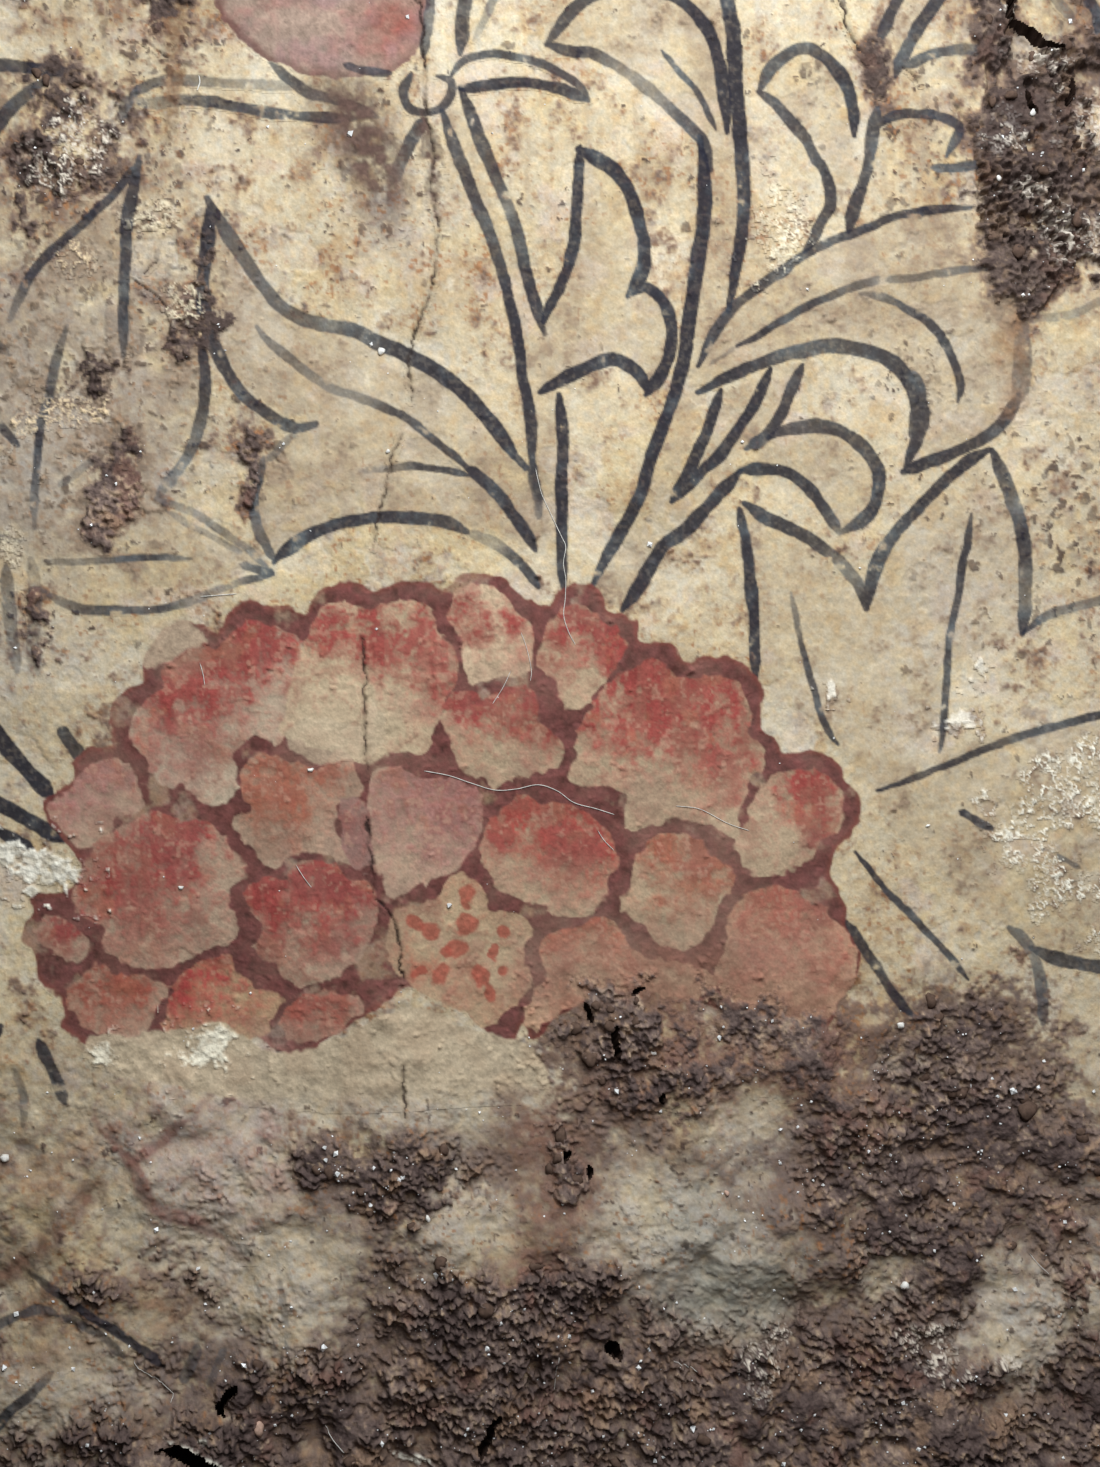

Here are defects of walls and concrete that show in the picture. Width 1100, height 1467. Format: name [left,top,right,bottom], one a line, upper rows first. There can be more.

crack [833,0,994,152]
crack [1005,0,1076,114]
damp [998,10,1100,178]
crack [368,0,445,554]
damp [975,174,1100,429]
damp [961,729,1100,926]
damp [13,1320,113,1388]
crack [154,1445,218,1467]
crack [215,1385,238,1418]
crack [478,1416,502,1461]
damp [628,1162,814,1410]
damp [881,1310,1025,1393]